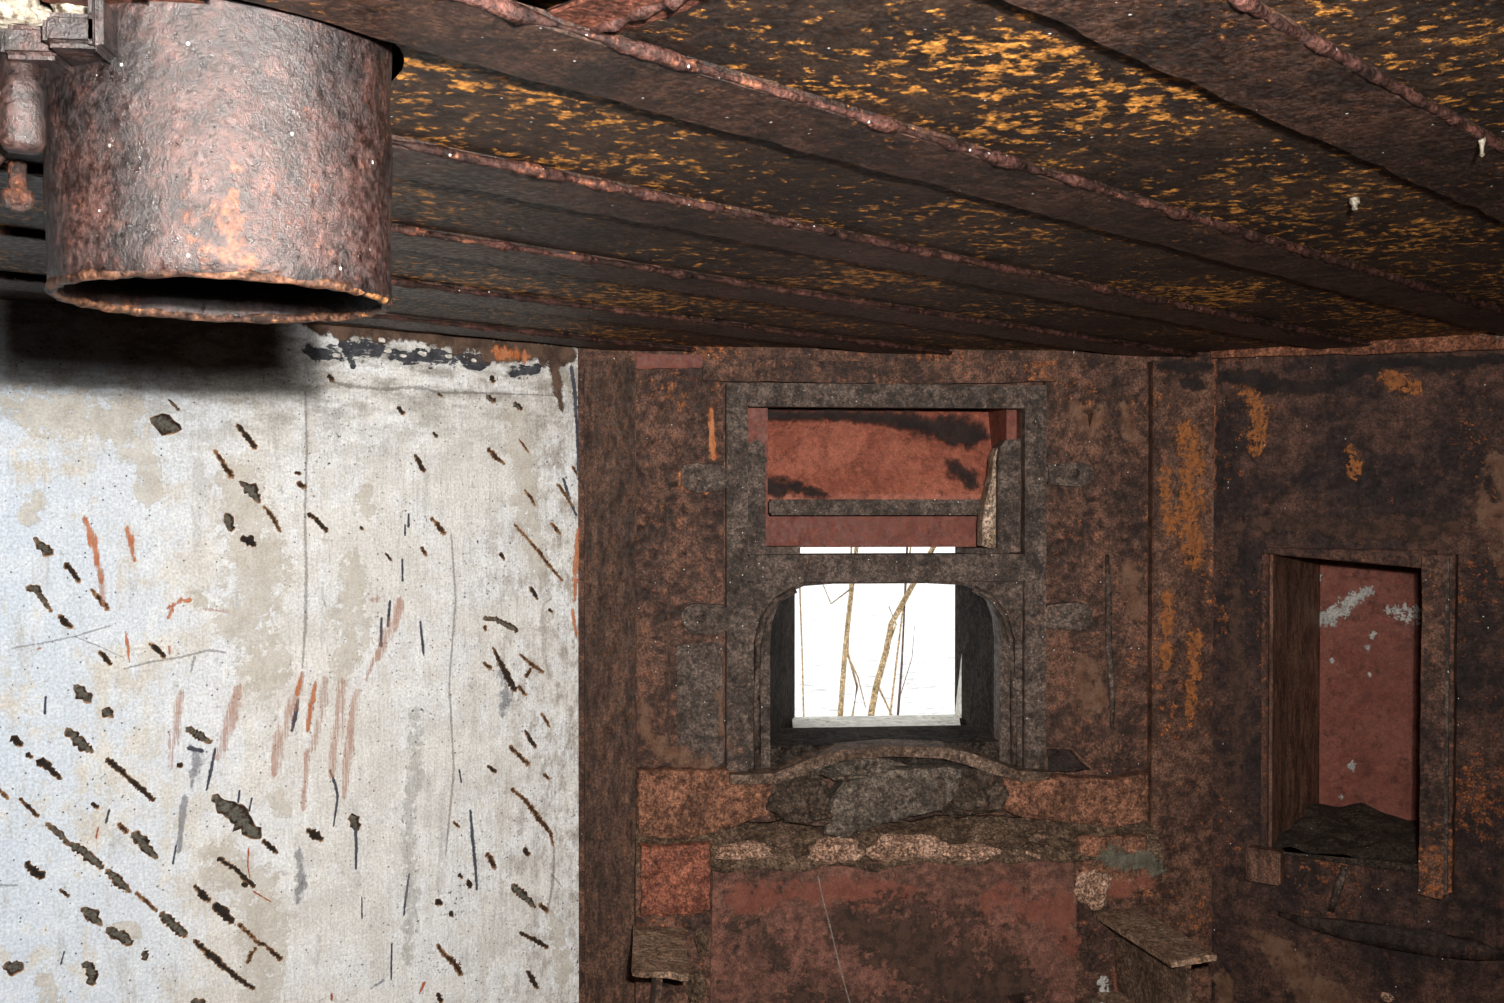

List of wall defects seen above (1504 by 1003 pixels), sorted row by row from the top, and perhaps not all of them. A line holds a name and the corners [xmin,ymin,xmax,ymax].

rust [452,0,1504,314]
rust [391,139,1371,357]
spalling [25,584,74,629]
rust [83,516,103,585]
peeling [187,423,293,705]
rust [1157,419,1208,572]
spalling [9,735,63,780]
spalling [73,684,114,718]
spalling [64,727,156,802]
rust [296,673,317,733]
peeling [0,788,294,1003]
rust [767,888,1050,1003]